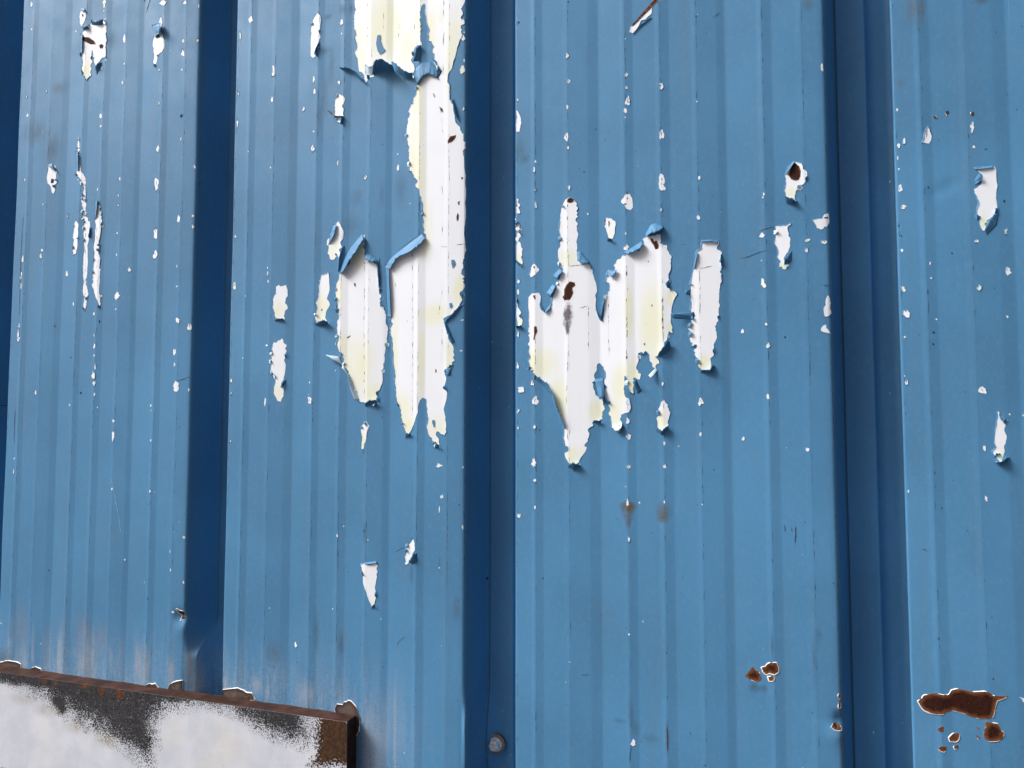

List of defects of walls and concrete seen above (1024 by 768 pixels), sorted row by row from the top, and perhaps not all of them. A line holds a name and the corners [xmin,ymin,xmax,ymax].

peeling [76,0,108,81]
peeling [67,135,120,315]
peeling [312,0,467,449]
peeling [759,213,830,270]
peeling [784,161,809,205]
peeling [974,165,1008,243]
peeling [267,267,288,322]
peeling [515,185,724,471]
peeling [264,338,289,406]
peeling [360,561,378,609]
corrosion [745,662,779,682]
corrosion [917,688,1008,753]